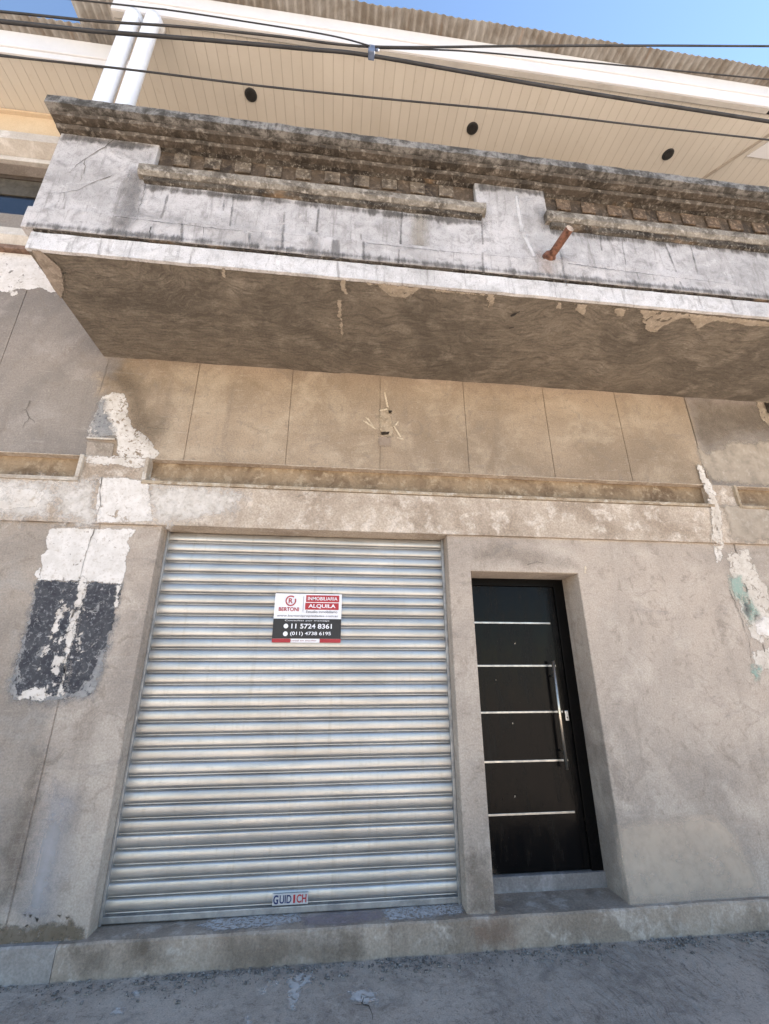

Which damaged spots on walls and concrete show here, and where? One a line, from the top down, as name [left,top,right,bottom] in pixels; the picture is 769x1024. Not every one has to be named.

peeling [0,250,64,298]
spalling [613,307,769,333]
peeling [0,392,242,703]
flaking render [697,441,769,679]